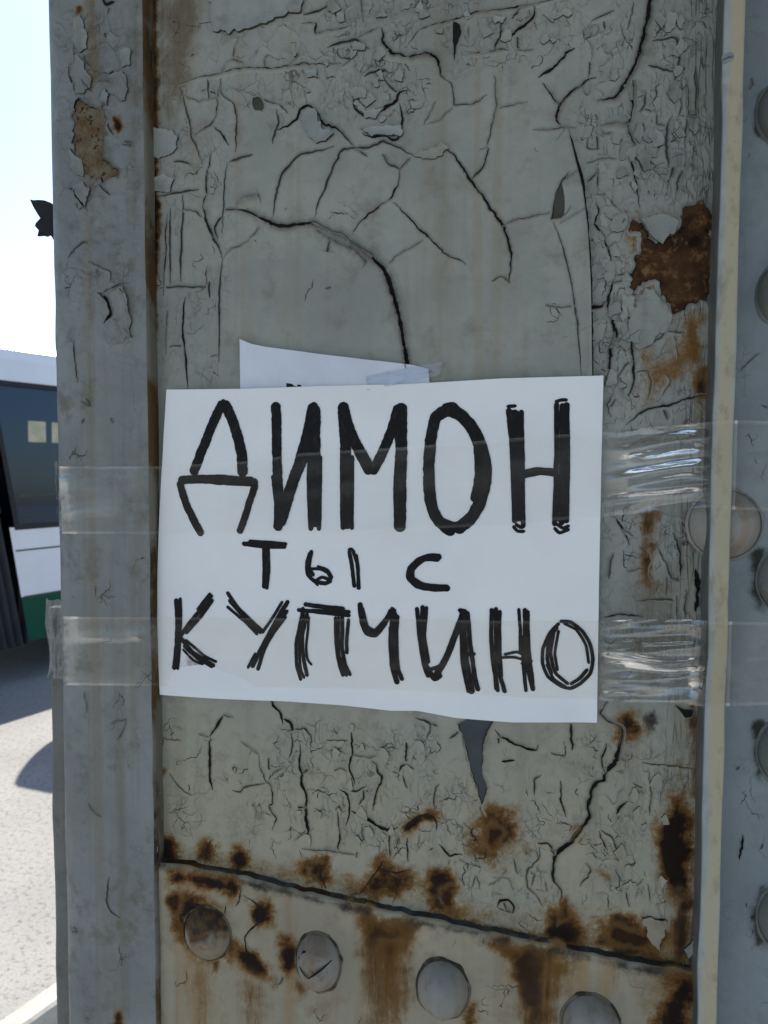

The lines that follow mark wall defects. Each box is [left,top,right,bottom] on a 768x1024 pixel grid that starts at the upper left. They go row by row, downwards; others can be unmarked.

peeling [68,148,91,208]
crack [147,0,756,432]
peeling [549,173,571,223]
rust [622,195,712,398]
crack [604,506,701,631]
peeling [455,718,497,806]
crack [163,700,696,948]
rust [164,836,262,949]
rust [207,940,271,1013]
rust [250,899,305,994]
crack [476,984,517,1015]
rust [346,786,695,1024]